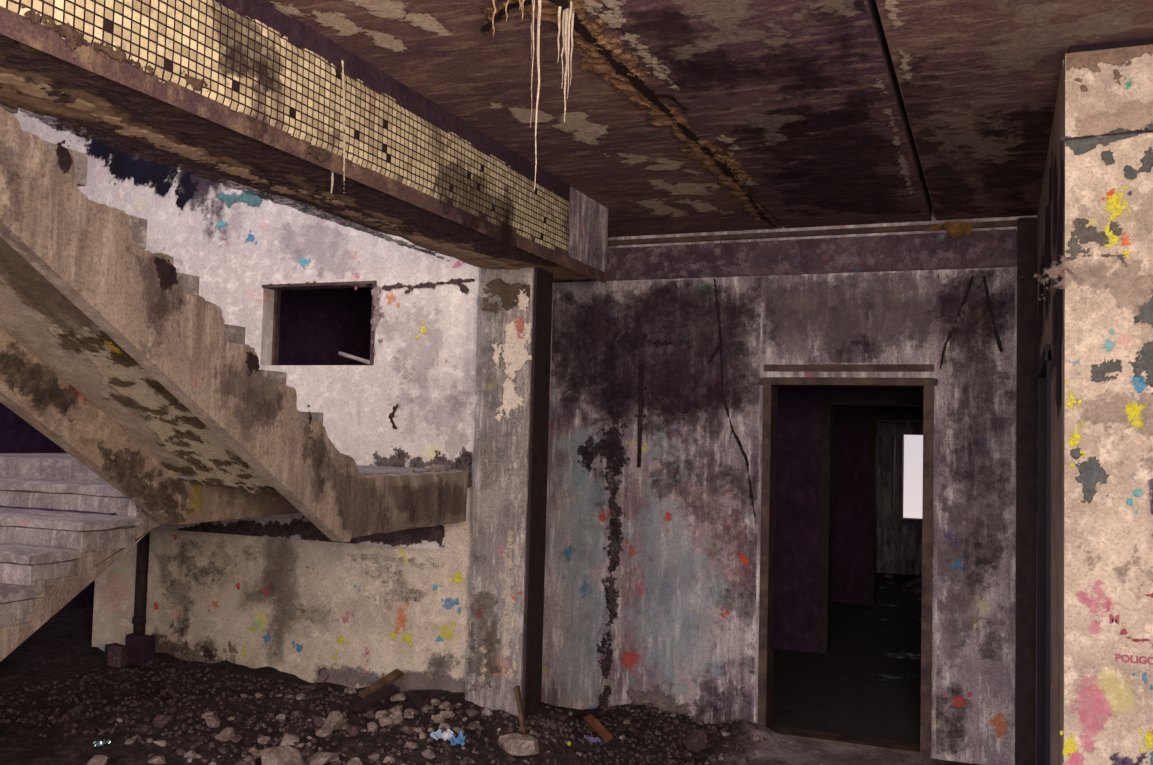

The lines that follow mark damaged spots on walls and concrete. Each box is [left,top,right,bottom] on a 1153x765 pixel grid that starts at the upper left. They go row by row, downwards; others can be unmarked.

flaking render [0,238,279,494]
damp [152,572,237,664]
damp [246,541,297,655]
spalling [0,0,559,422]
crack [267,278,474,294]
crack [596,328,627,708]
rust [479,0,766,221]
crack [480,0,776,227]
damp [552,272,1015,633]
peeling [1039,122,1153,417]
crack [1059,128,1153,141]